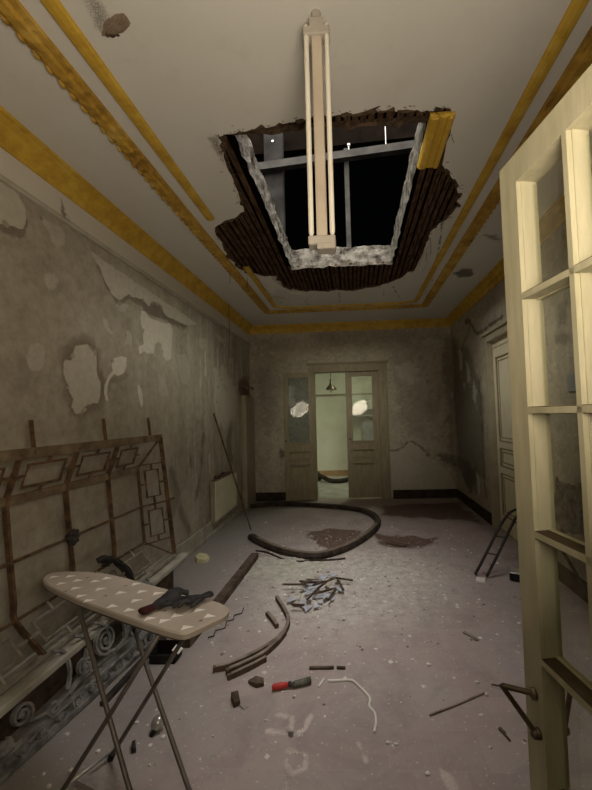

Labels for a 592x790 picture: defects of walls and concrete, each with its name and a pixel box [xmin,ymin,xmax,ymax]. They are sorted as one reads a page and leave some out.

spalling [82,0,131,38]
spalling [232,116,429,270]
flaking render [91,252,196,362]
flaking render [254,273,308,301]
flaking render [417,241,436,275]
flaking render [56,333,128,423]